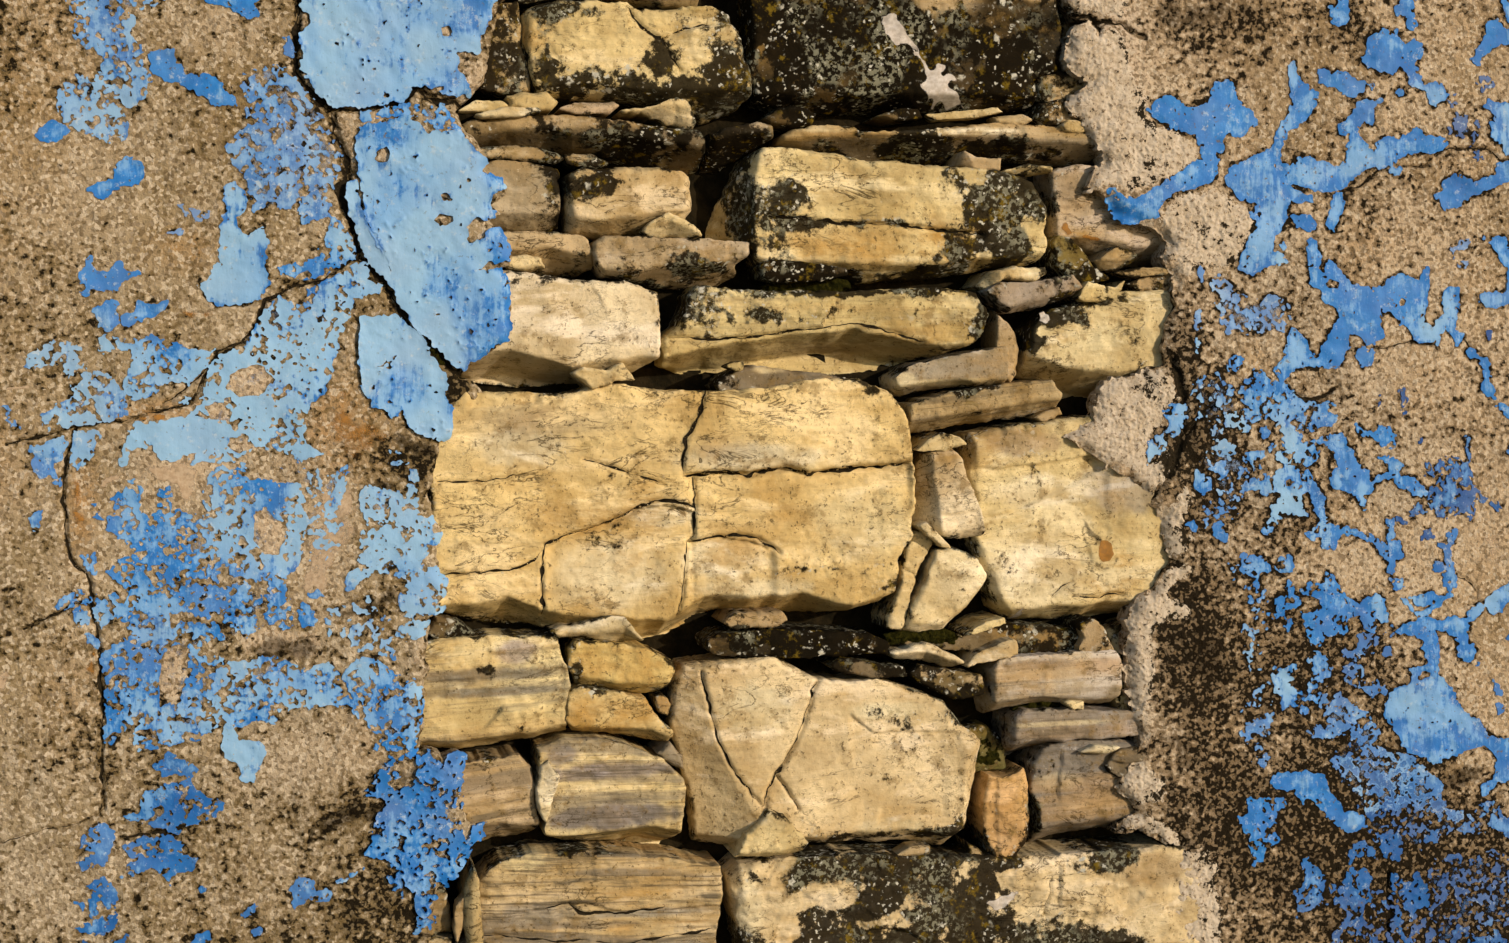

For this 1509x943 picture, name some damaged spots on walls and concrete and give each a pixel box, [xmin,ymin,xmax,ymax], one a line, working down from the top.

crack [4,0,462,857]
crack [701,671,816,808]